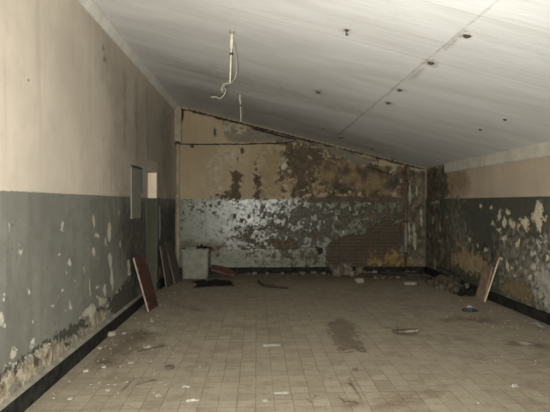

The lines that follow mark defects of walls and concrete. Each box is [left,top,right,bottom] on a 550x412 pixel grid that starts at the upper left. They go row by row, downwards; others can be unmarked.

spalling [92,214,111,245]
peeling [211,142,423,267]
damp [272,136,462,276]
peeling [451,199,550,314]
spalling [0,252,121,404]